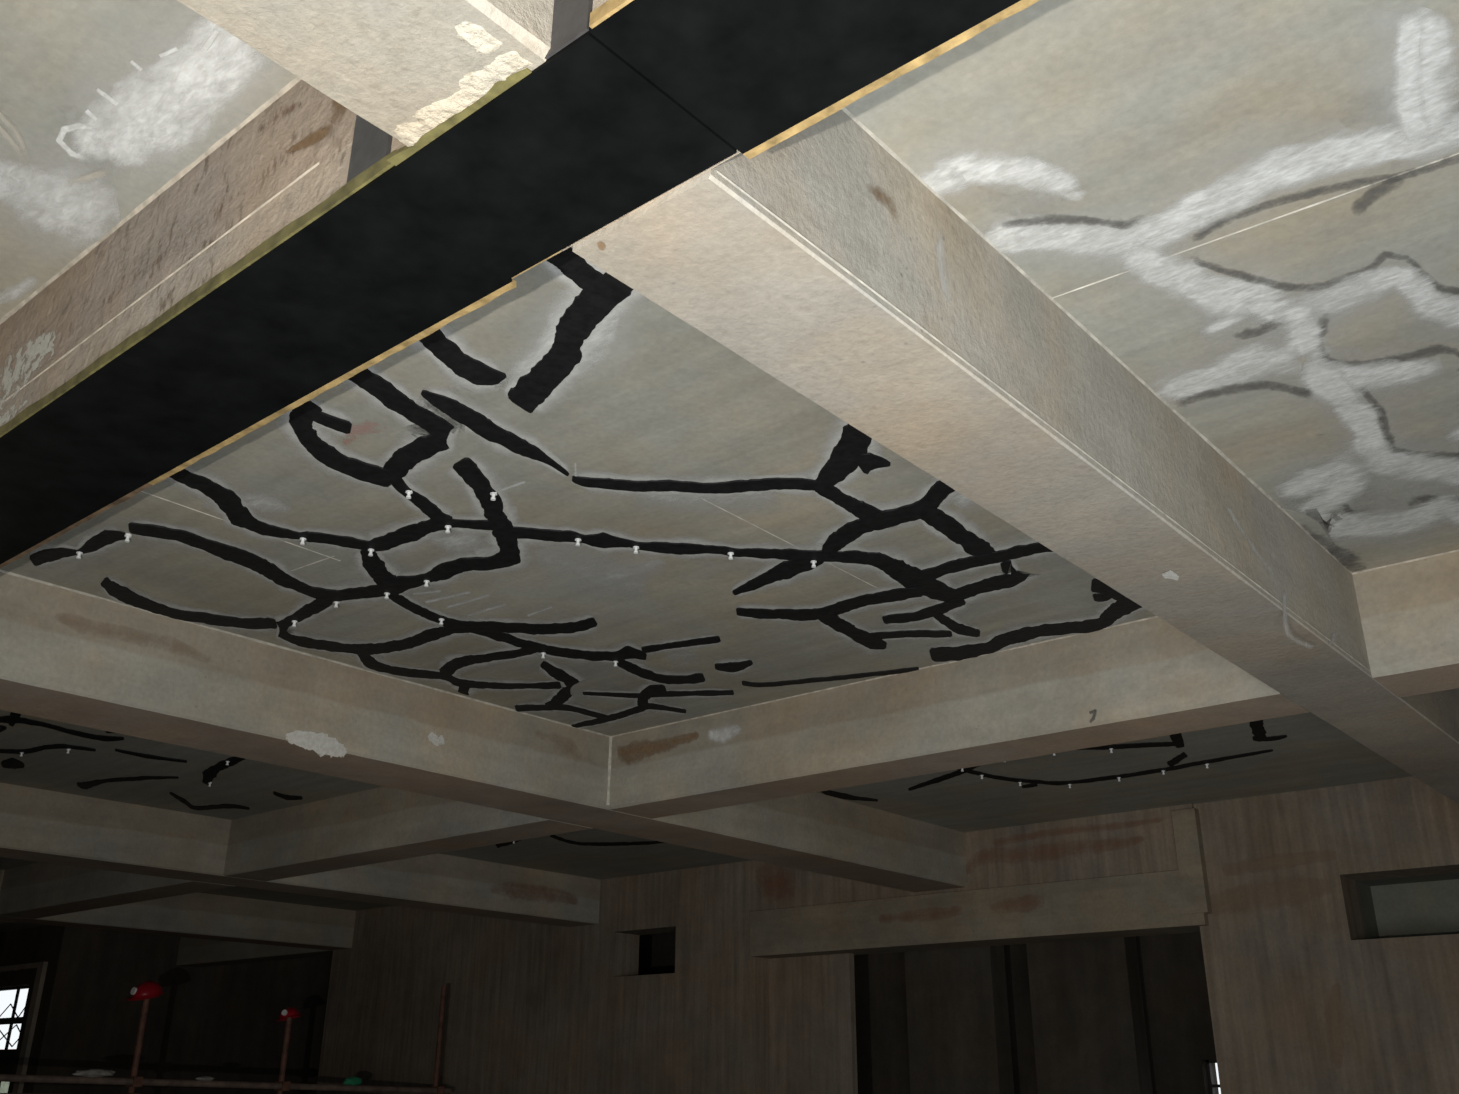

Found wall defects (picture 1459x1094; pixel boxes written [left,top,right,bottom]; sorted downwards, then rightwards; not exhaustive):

leakage [0,20,259,241]
spalling [394,22,532,146]
leakage [921,10,1459,568]
crack [30,246,1146,729]
crack [0,712,303,811]
peeling [286,730,347,757]
crack [820,720,1287,802]